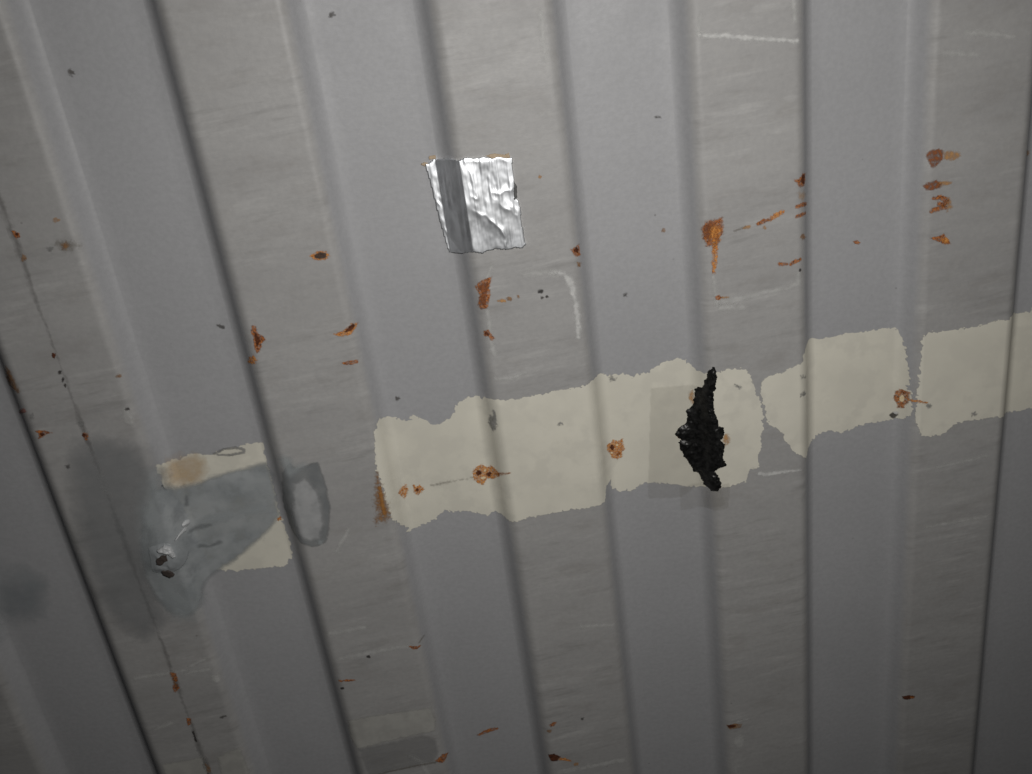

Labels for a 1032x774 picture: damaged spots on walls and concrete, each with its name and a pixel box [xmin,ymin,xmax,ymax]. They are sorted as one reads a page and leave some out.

rust [927,149,959,167]
rust [924,180,951,213]
rust [743,202,806,229]
rust [702,218,723,273]
rust [476,278,519,309]
rust [248,326,265,364]
rust [894,390,931,408]
peeling [374,308,1032,532]
rust [607,439,625,458]
rust [473,465,510,485]
peeling [155,442,293,572]